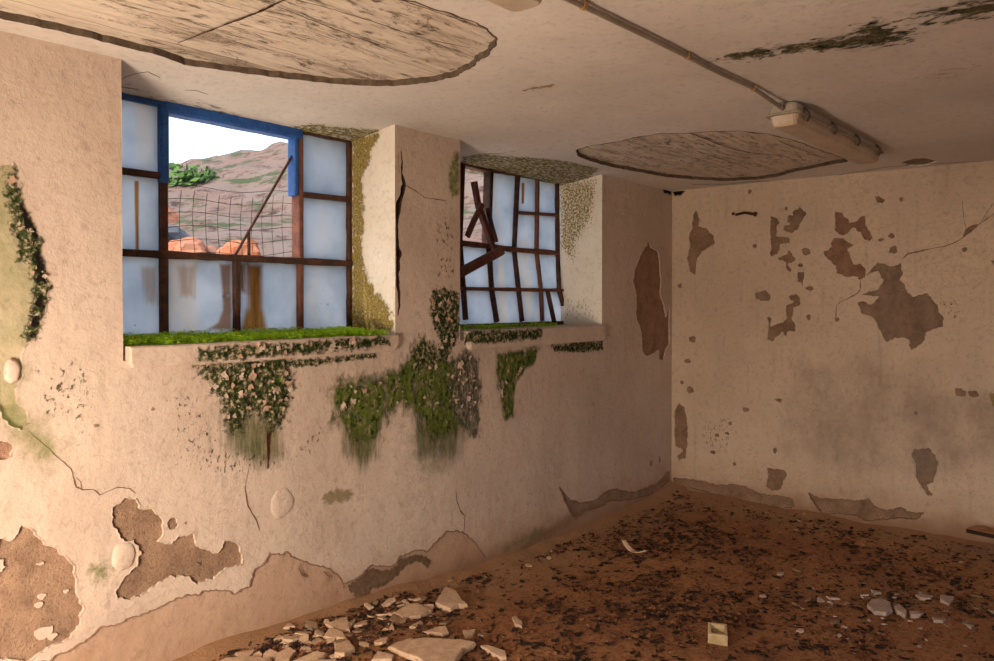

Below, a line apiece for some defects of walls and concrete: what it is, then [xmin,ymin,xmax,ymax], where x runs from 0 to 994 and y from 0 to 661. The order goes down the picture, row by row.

crack [179,0,484,53]
peeling [0,161,50,462]
crack [396,150,447,315]
spalling [633,239,670,361]
spalling [766,206,814,342]
crack [835,270,877,316]
spalling [823,211,963,352]
crack [903,200,994,258]
crack [30,432,136,495]
leakage [174,396,320,472]
leakage [448,350,482,439]
flaking render [0,496,487,661]